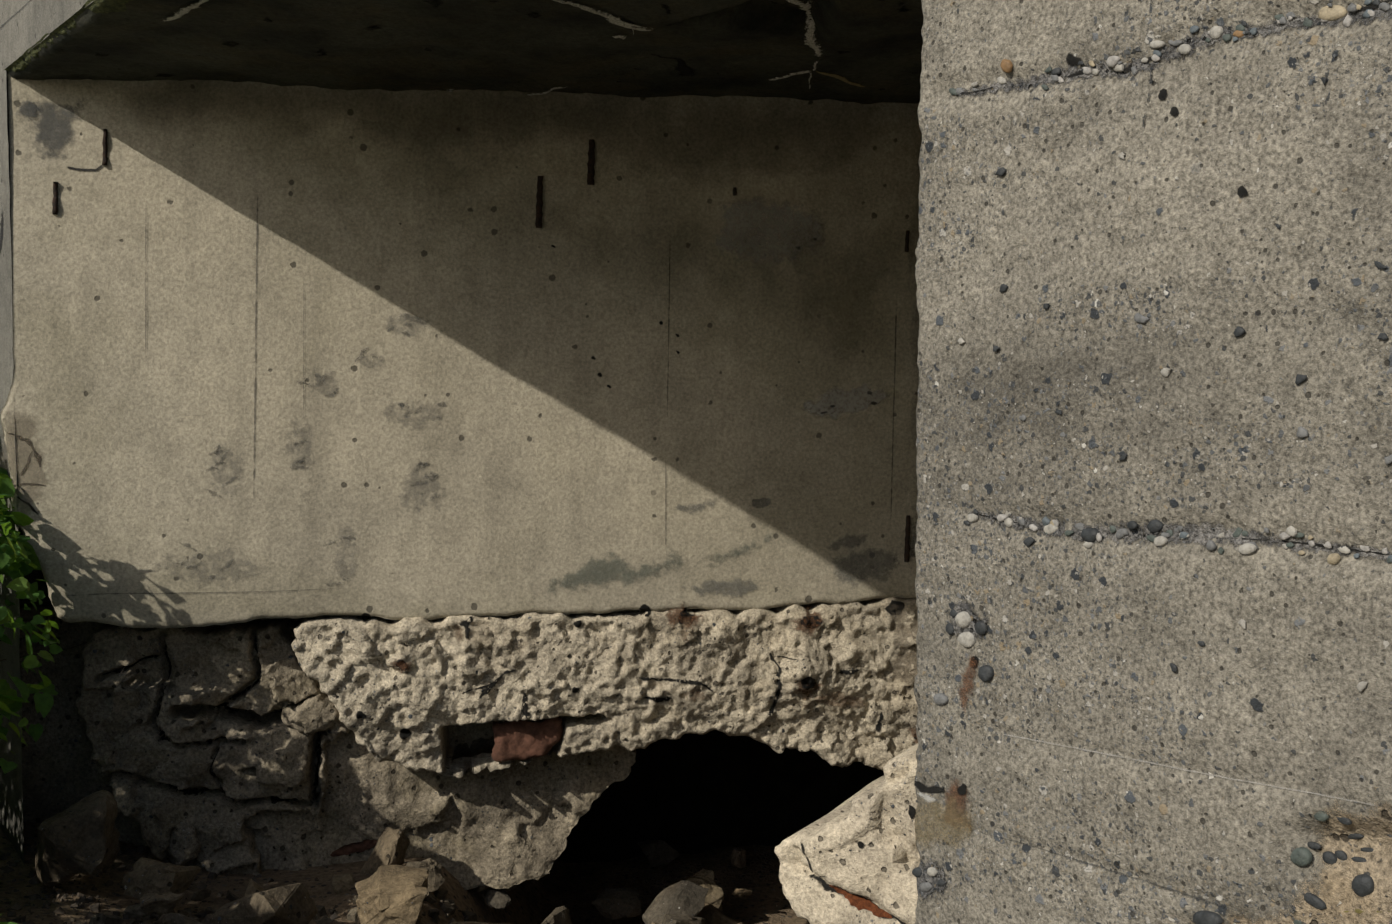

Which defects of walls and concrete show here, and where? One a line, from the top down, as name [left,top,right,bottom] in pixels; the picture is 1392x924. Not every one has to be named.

crack [164,0,209,21]
crack [553,0,695,76]
crack [769,0,865,89]
damp [19,101,75,158]
damp [551,553,681,587]
rust [944,783,970,829]